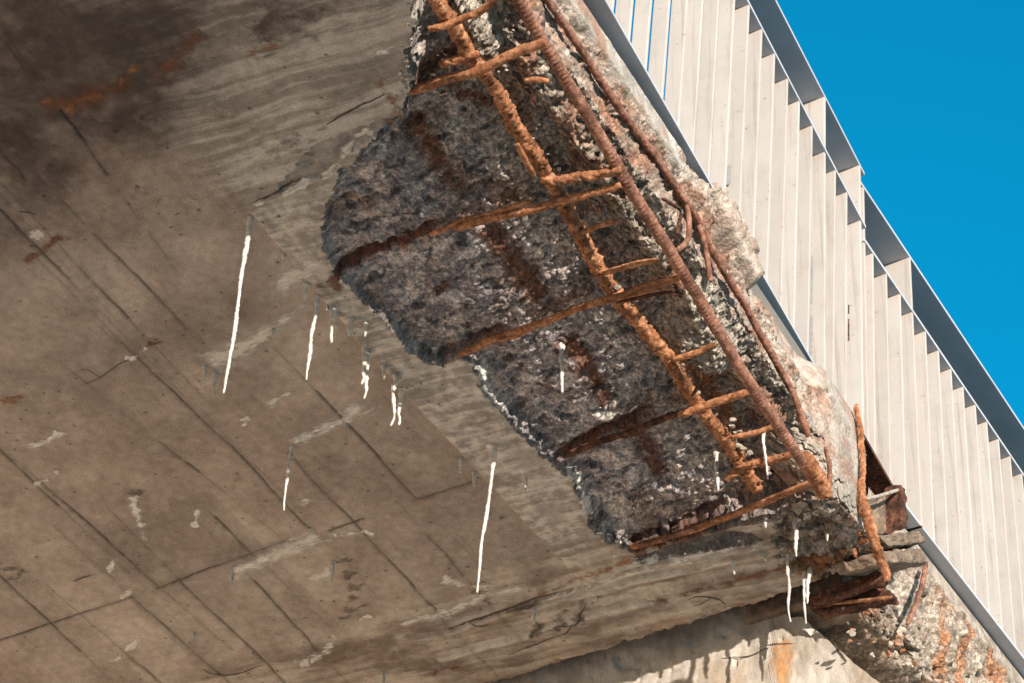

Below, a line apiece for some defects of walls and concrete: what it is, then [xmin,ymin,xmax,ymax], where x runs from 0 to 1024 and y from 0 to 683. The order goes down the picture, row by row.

crack [327,94,385,124]
rust [480,223,549,304]
spalling [320,0,891,582]
leakage [201,304,312,374]
leakage [478,358,492,388]
rust [554,333,611,407]
leakage [231,528,374,580]
crack [449,592,557,630]
crack [509,607,585,655]
rust [726,551,846,586]
spalling [833,596,892,605]
spalling [905,561,928,626]